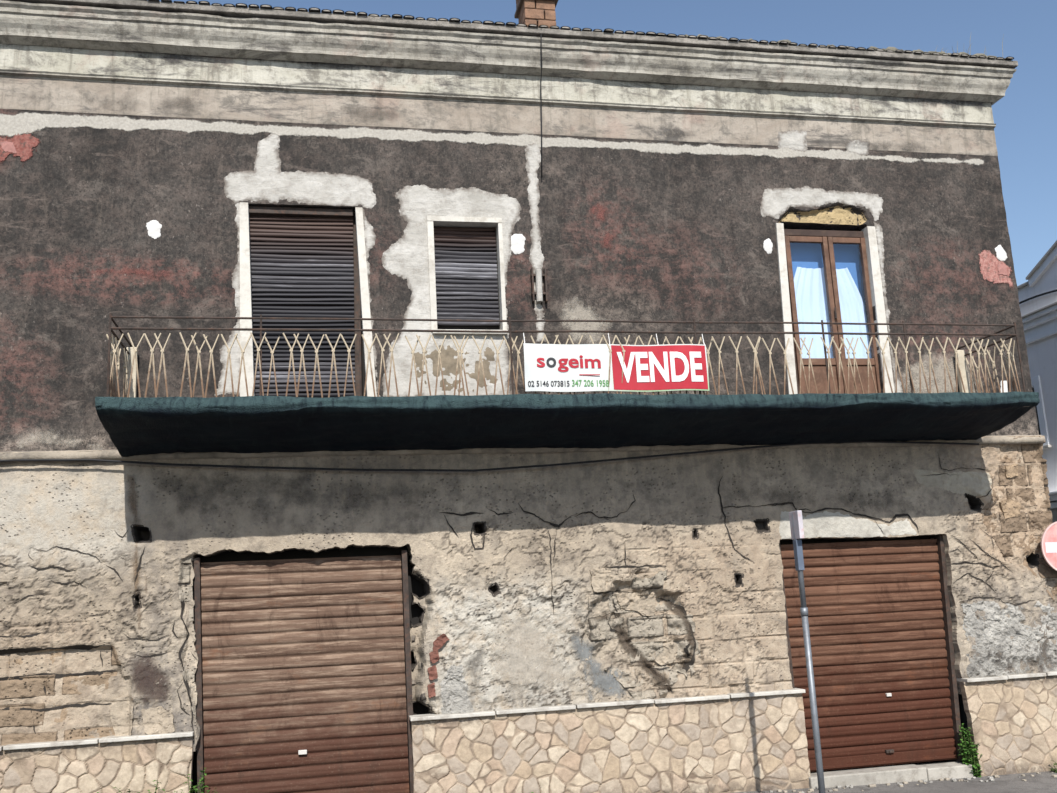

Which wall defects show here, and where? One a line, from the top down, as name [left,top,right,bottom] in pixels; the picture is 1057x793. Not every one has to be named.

peeling [0,133,39,165]
spalling [779,206,867,225]
peeling [979,250,1013,289]
crack [924,451,993,498]
crack [0,530,145,606]
crack [440,495,636,614]
crack [718,476,919,562]
crack [945,528,1034,608]
crack [0,558,197,734]
spalling [411,572,450,715]
crack [588,549,696,693]